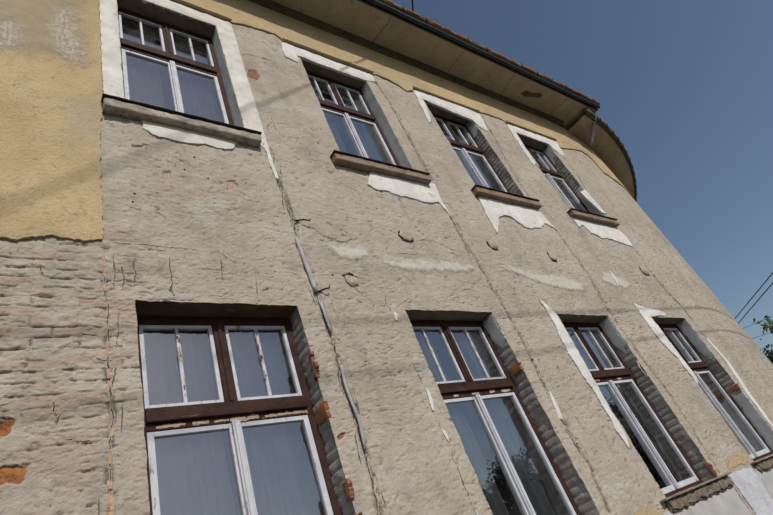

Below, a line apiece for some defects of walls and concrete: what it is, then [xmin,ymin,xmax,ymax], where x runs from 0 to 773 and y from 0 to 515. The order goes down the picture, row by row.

flaking render [141,120,238,150]
flaking render [367,172,451,218]
flaking render [478,196,556,249]
crack [215,249,236,282]
crack [51,240,194,515]
flaking render [308,351,320,382]
crack [0,403,13,421]
flaking render [0,419,15,437]
peeling [156,401,331,429]
flaking render [0,464,30,485]
flaking render [342,478,355,502]